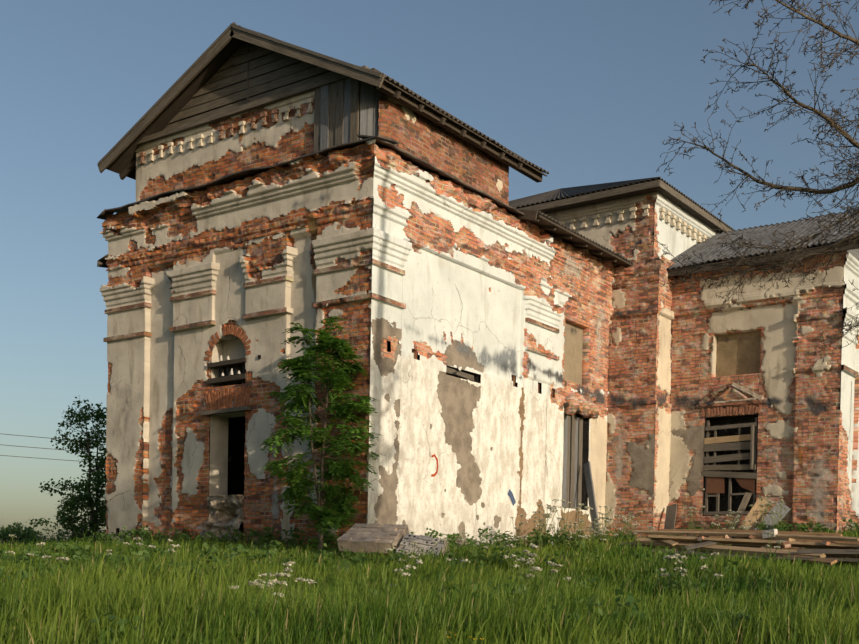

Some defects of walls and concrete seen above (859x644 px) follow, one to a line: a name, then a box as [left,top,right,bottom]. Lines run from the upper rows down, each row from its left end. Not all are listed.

flaking render [388,96,416,123]
flaking render [100,103,661,549]
flaking render [699,266,845,439]
flaking render [626,406,705,514]